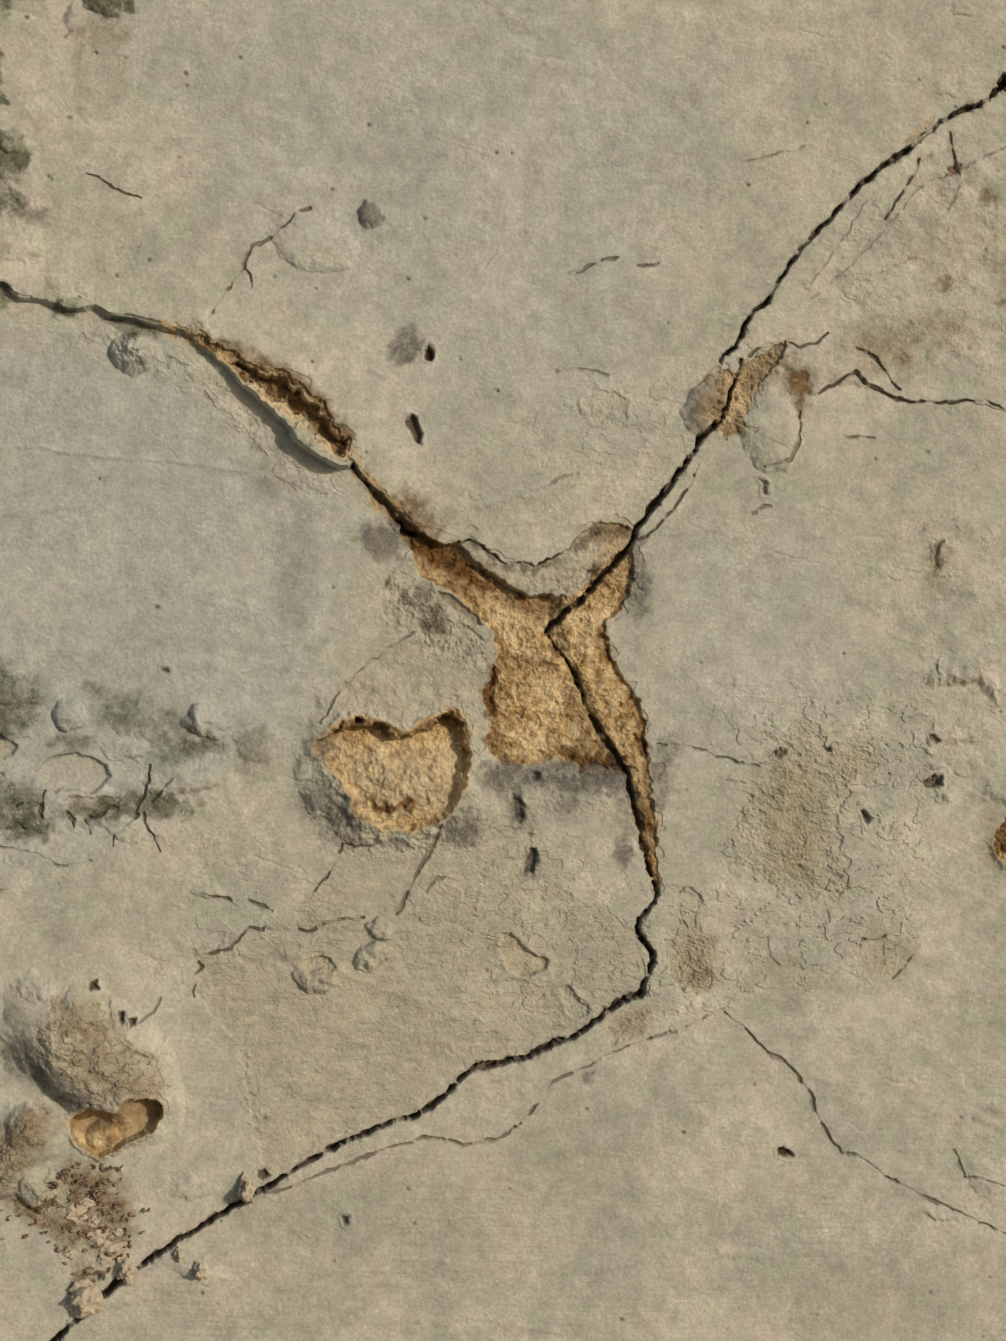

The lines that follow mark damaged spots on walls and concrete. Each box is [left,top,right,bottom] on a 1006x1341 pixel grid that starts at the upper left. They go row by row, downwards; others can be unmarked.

water stain [89,0,134,17]
water stain [0,130,29,212]
crack [85,172,143,200]
crack [78,206,313,356]
spalling [188,323,363,465]
spalling [704,336,793,442]
crack [133,70,1006,1278]
crack [0,763,175,869]
peeling [190,515,722,1182]
spalling [990,815,1006,867]
spalling [57,1088,169,1161]
crack [47,1274,125,1341]